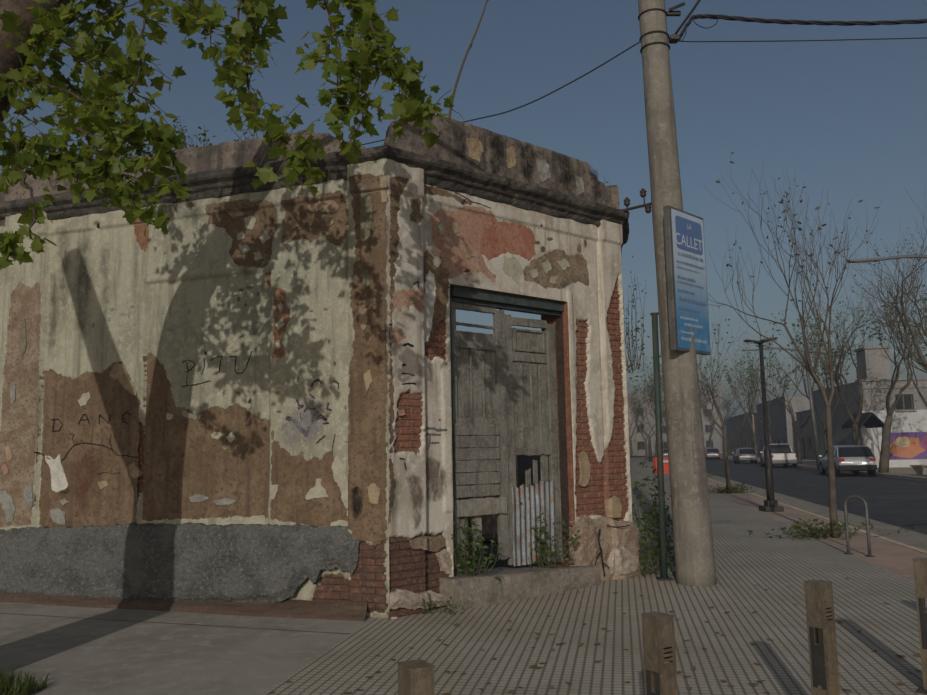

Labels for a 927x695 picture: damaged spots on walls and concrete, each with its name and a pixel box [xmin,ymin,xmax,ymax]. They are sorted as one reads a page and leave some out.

peeling [506,147,516,168]
peeling [536,159,551,182]
peeling [0,173,589,619]
spalling [573,279,629,522]